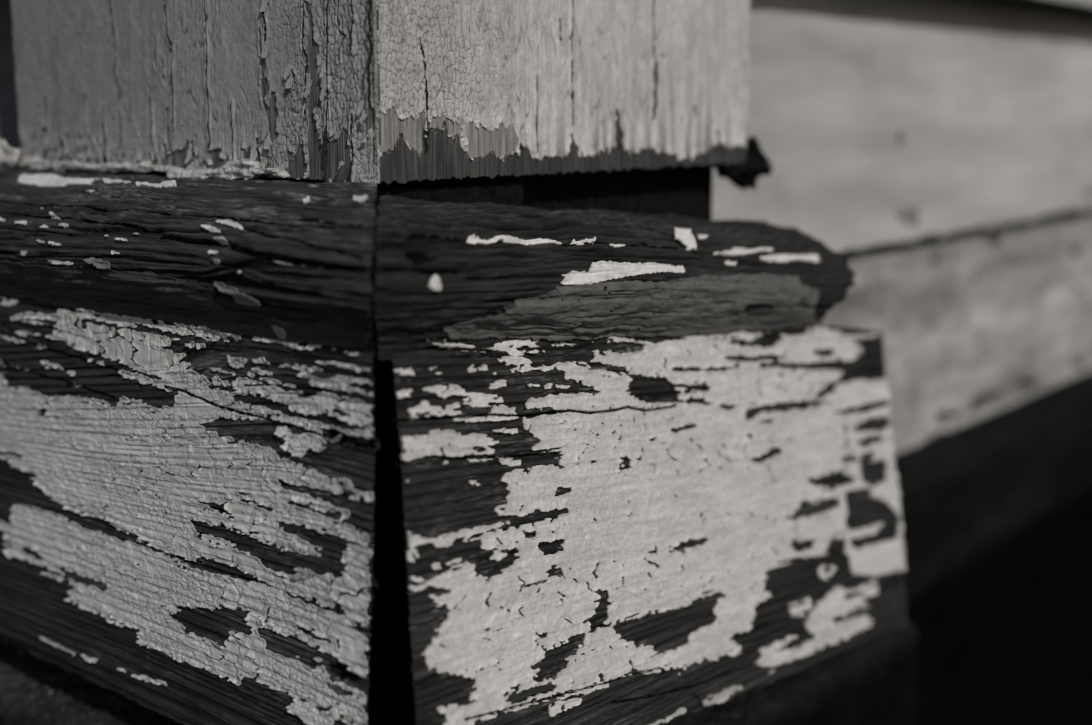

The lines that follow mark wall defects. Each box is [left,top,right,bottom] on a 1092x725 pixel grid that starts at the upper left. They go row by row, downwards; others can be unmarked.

crack [203,0,233,158]
crack [259,3,267,42]
crack [302,0,373,181]
peeling [20,1,747,184]
crack [419,40,429,156]
peeling [37,207,69,246]
peeling [86,178,176,193]
peeling [201,219,245,264]
crack [0,200,474,275]
crack [416,345,491,353]
peeling [0,233,374,725]
peeling [394,247,907,725]